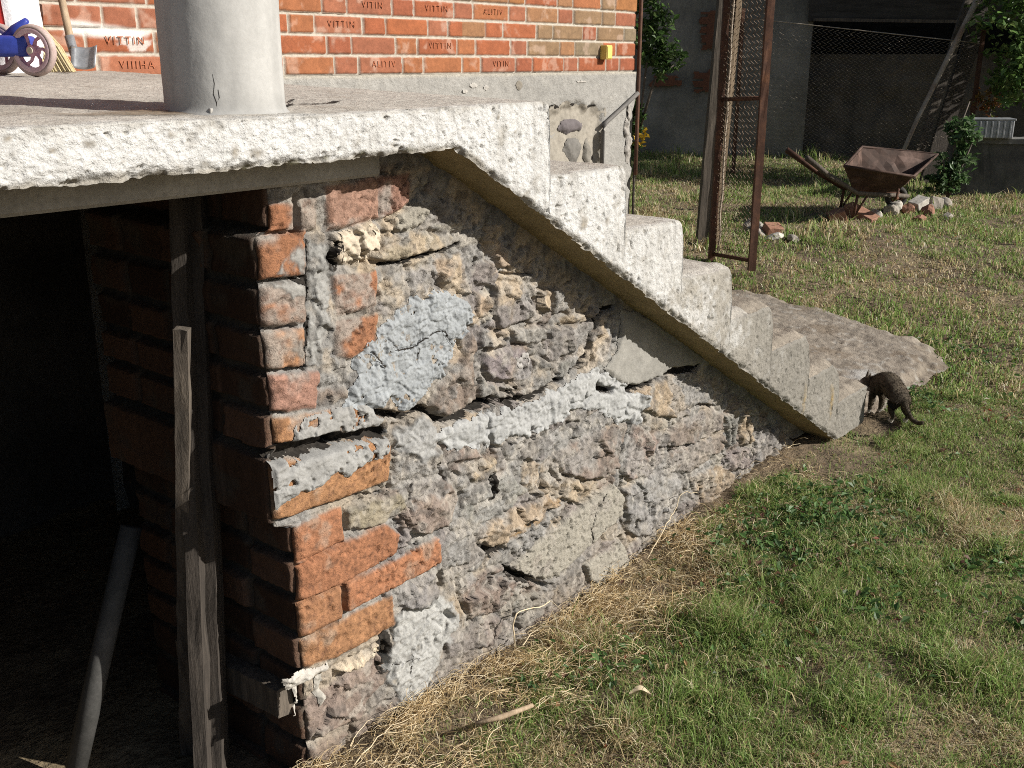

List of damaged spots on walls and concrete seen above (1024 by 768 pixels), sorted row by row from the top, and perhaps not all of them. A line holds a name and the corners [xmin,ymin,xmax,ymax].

spalling [325,224,381,272]
crack [258,305,611,460]
spalling [375,630,392,675]
peeling [282,662,329,716]